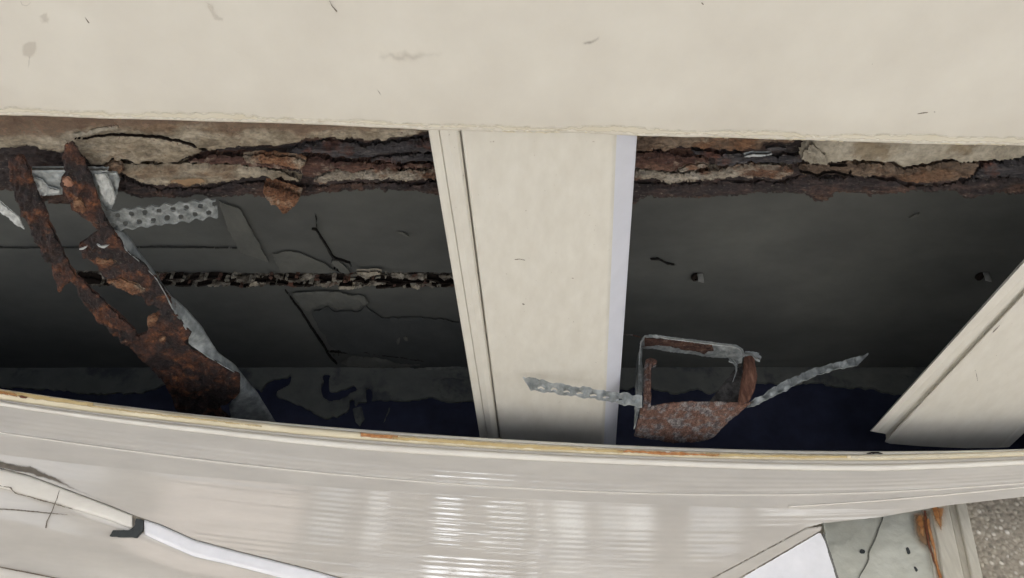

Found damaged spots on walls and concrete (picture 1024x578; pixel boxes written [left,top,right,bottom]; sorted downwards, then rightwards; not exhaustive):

rust [0,115,439,214]
spalling [0,112,1024,186]
rust [633,136,1024,201]
crack [312,215,351,274]
hole [78,272,110,286]
peeling [162,200,474,426]
crack [285,289,423,365]
rust [645,337,714,354]
rust [0,390,93,406]
peeling [0,367,165,395]
rust [915,507,944,578]